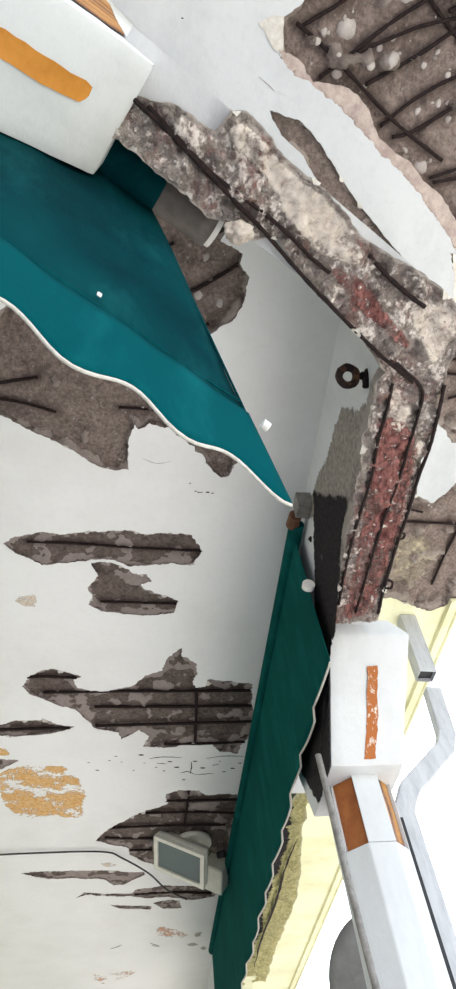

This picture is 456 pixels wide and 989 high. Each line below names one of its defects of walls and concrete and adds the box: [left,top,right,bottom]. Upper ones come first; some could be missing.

spalling [112,0,456,624]
rust [333,271,409,348]
spalling [0,306,178,471]
spalling [3,530,203,616]
rust [344,417,418,619]
spalling [0,718,75,738]
peeling [0,748,86,818]
spalling [22,779,237,909]
spalling [22,648,254,756]
mould [254,807,294,944]